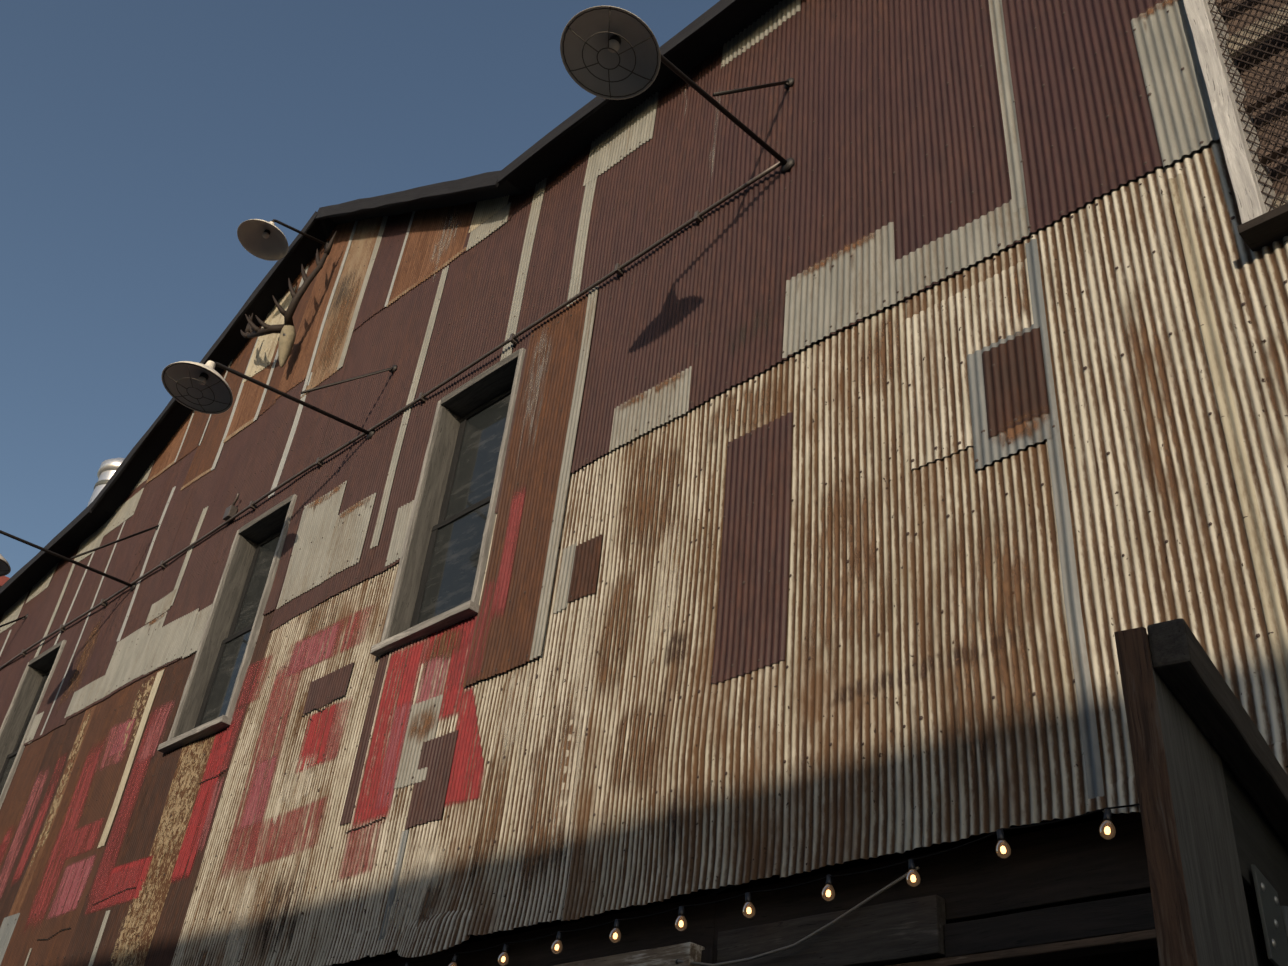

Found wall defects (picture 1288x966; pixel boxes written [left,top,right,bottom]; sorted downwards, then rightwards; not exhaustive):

rust [862,317,898,398]
rust [1124,296,1199,516]
rust [1269,338,1288,407]
rust [599,450,676,690]
rust [806,477,884,661]
rust [667,634,686,661]
rust [837,522,1049,780]
rust [613,690,666,788]
rust [668,796,677,845]